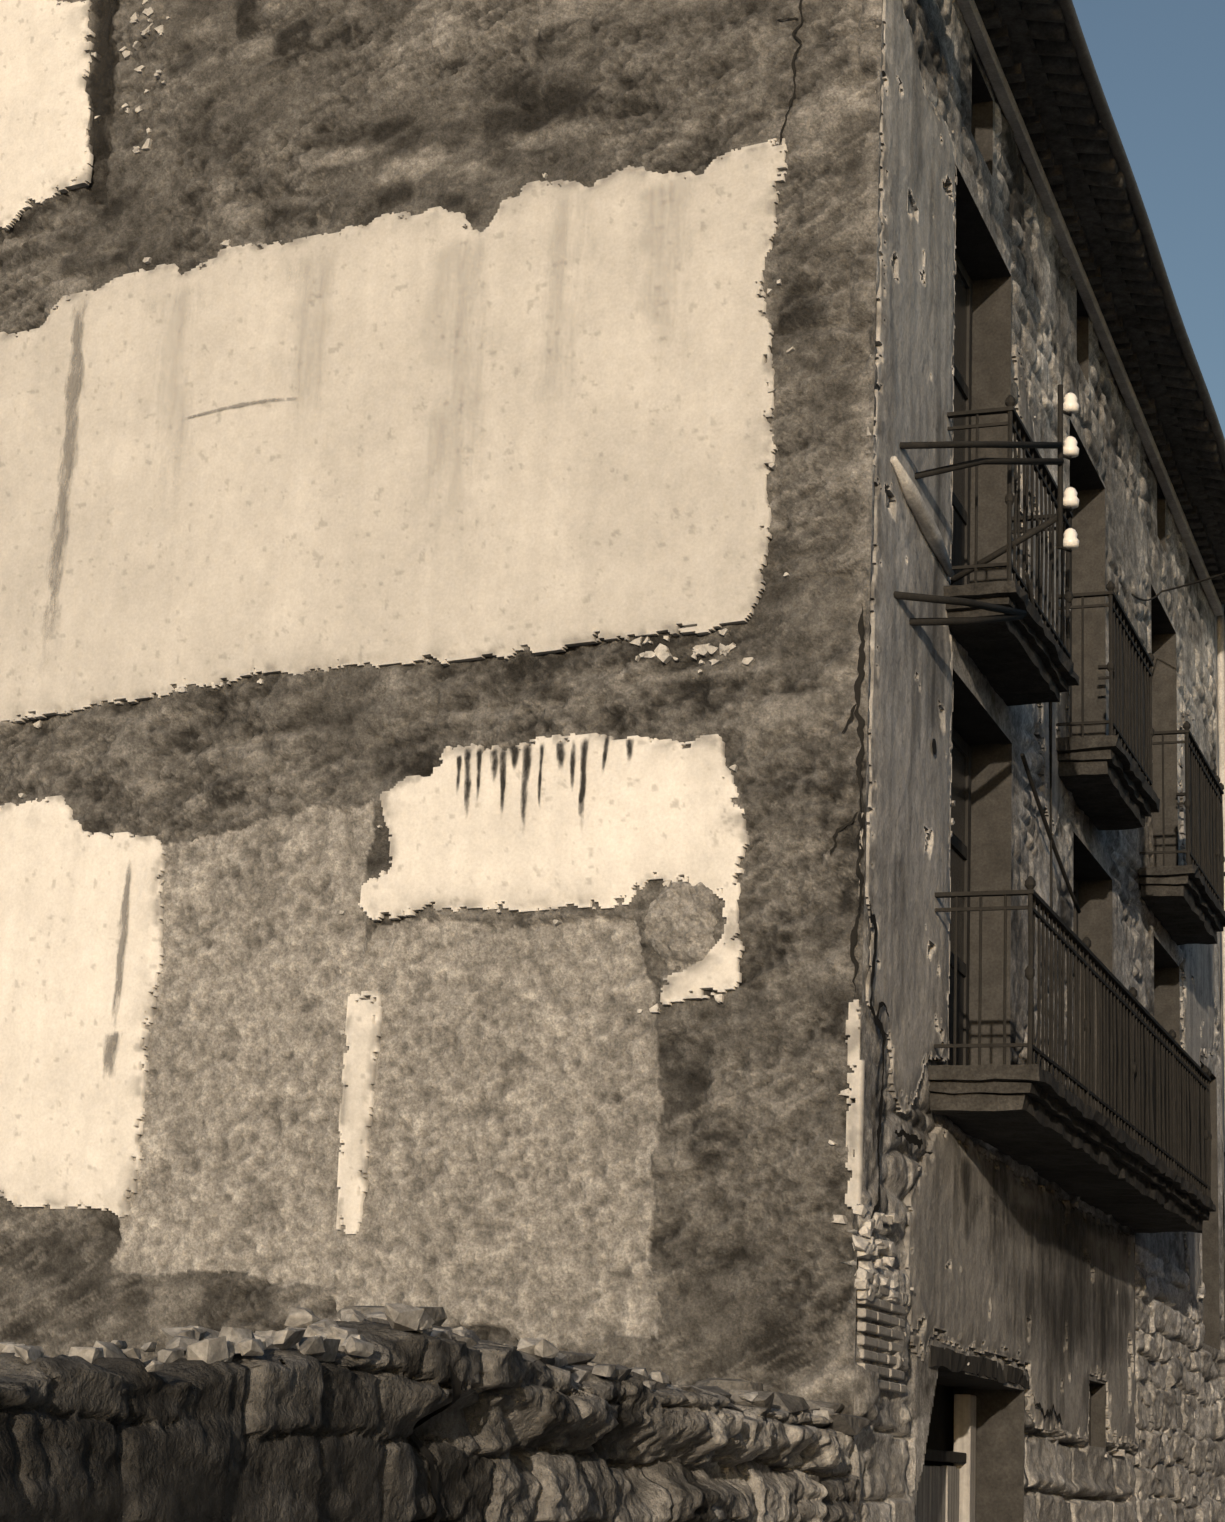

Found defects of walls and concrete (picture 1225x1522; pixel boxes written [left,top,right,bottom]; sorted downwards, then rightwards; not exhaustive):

flaking render [0,0,102,231]
damp [88,0,117,153]
crack [777,0,803,145]
damp [50,315,82,600]
flaking render [0,138,795,728]
flaking render [0,793,167,1218]
damp [104,1033,118,1071]
damp [113,869,130,1007]
flaking render [336,990,383,1234]
damp [456,736,632,818]
flaking render [340,733,750,1013]
flaking render [828,0,1200,1522]